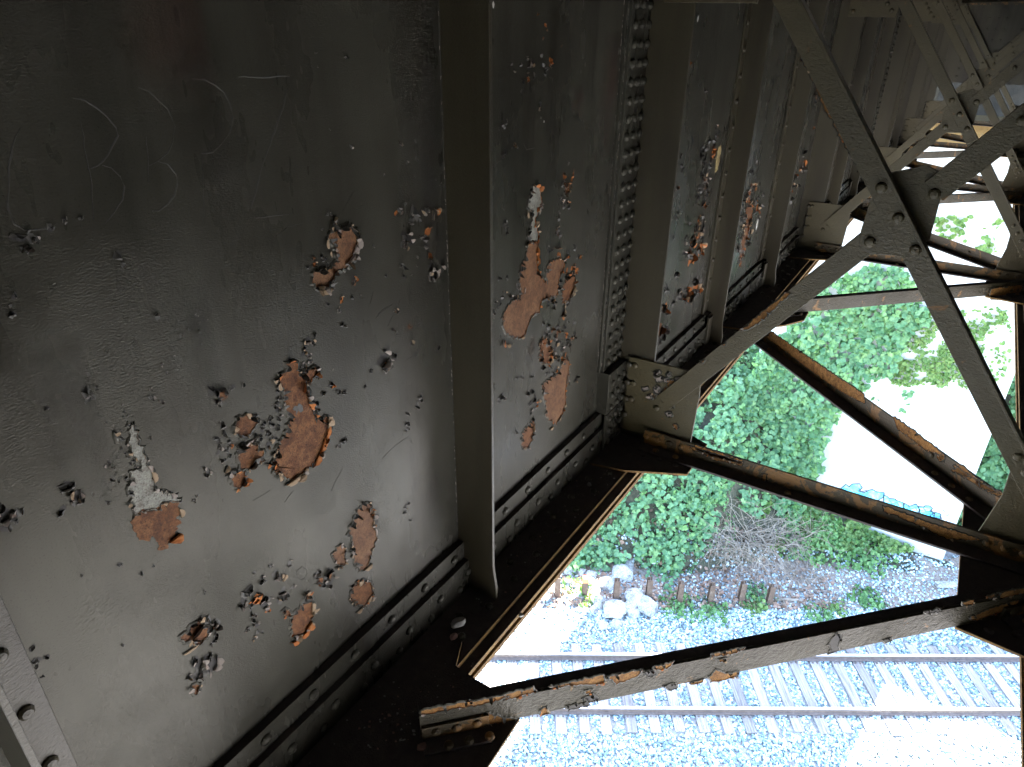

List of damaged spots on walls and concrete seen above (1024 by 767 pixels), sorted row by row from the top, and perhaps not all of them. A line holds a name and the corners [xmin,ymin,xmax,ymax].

peeling [305,212,375,328]
peeling [493,161,582,451]
peeling [205,331,347,493]
peeling [104,404,199,551]
corrosion [689,444,744,467]
corrosion [893,416,1003,497]
corrosion [882,505,982,542]
peeling [239,500,379,646]
corrosion [961,587,1024,622]
peeling [176,615,225,697]
corrosion [419,660,675,727]
corrosion [689,646,746,685]